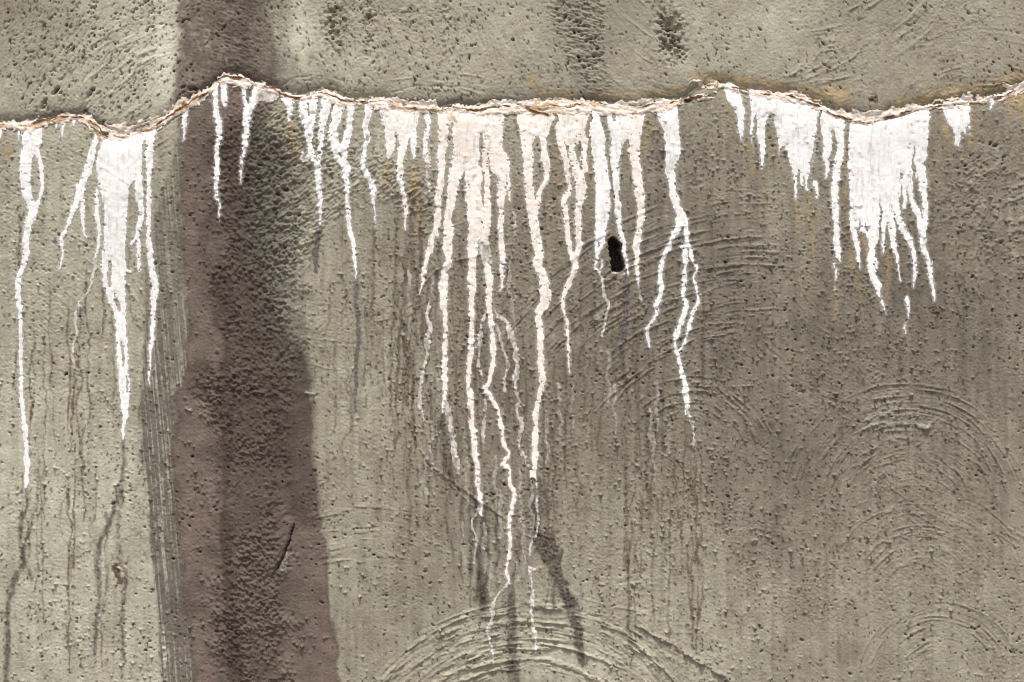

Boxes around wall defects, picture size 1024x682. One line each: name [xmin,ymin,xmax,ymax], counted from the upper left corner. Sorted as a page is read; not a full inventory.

crack [0,72,1024,141]
water stain [724,82,936,340]
efflorescence [943,105,971,147]
water stain [4,119,76,682]
water stain [58,0,703,682]